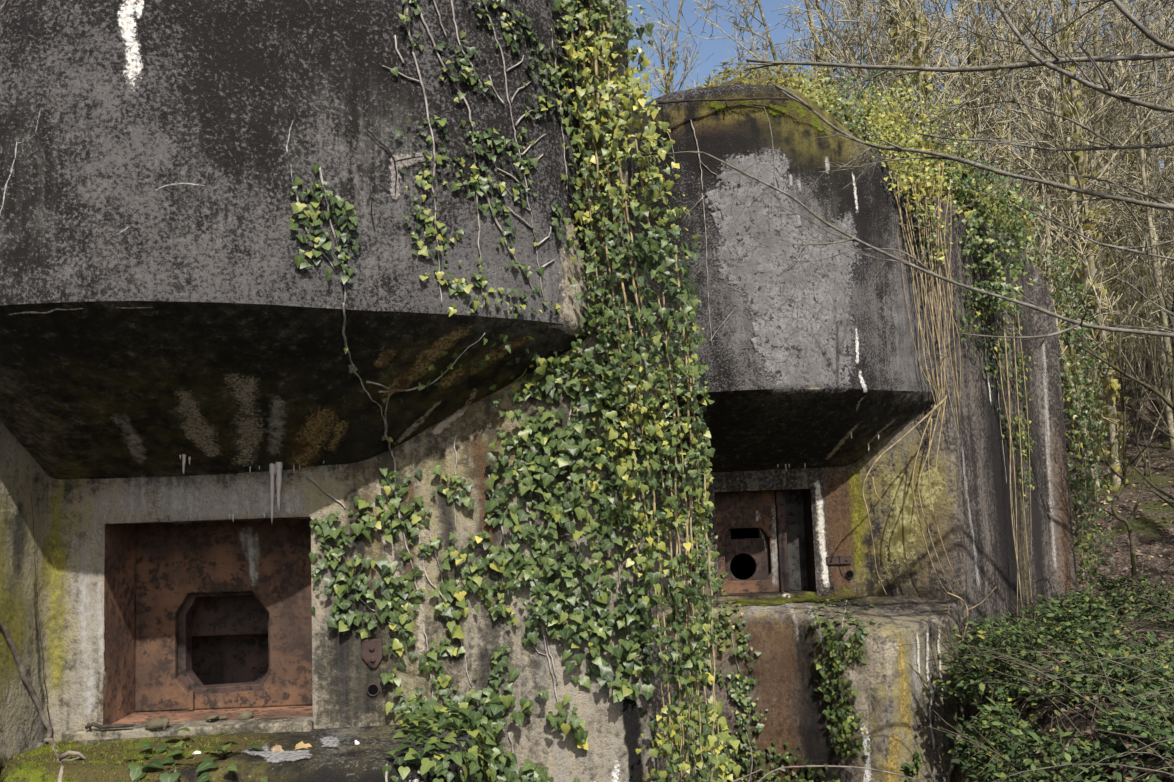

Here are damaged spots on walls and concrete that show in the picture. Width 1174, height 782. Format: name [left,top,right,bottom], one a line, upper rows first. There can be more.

damp [162,487,300,515]
damp [849,473,863,567]
damp [984,377,1021,587]
damp [1045,392,1056,566]
damp [34,496,65,700]
damp [844,632,899,782]
damp [913,630,943,749]